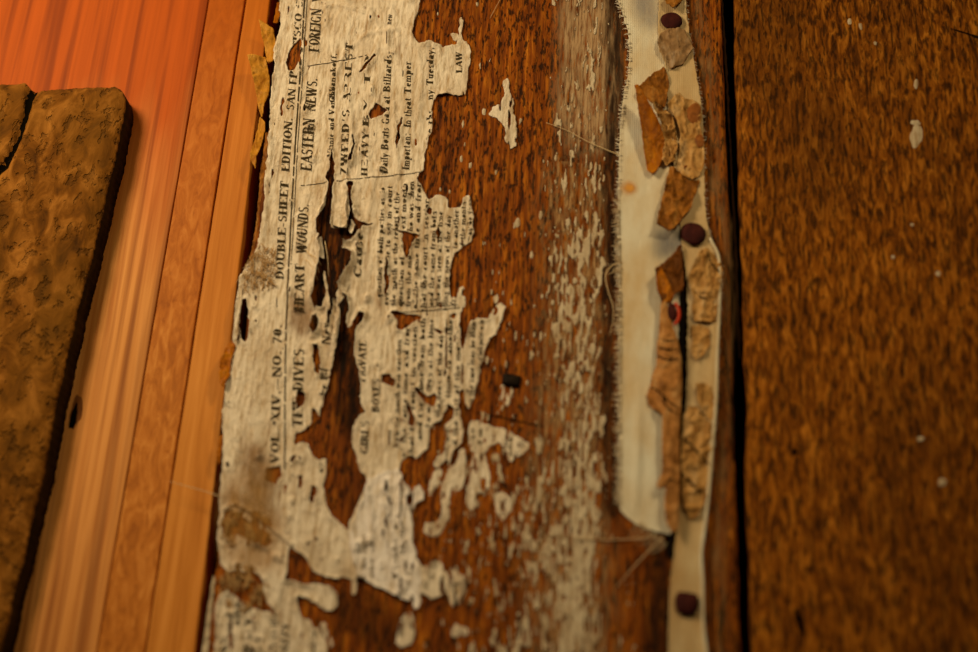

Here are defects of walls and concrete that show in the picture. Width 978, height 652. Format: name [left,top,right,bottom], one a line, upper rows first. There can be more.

crack [0,90,38,175]
peeling [440,0,613,652]